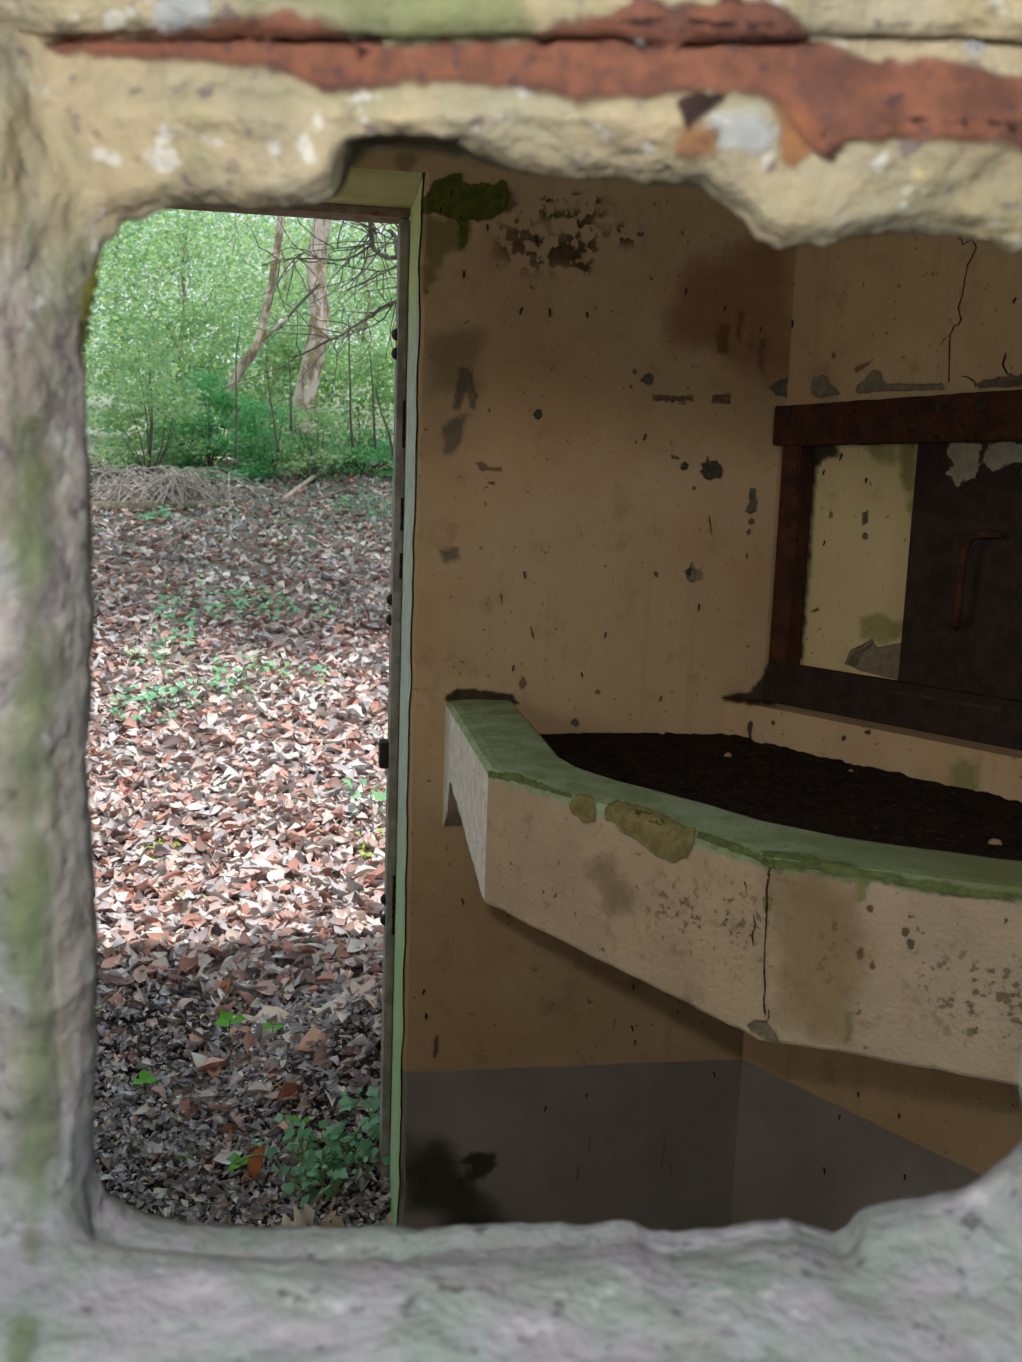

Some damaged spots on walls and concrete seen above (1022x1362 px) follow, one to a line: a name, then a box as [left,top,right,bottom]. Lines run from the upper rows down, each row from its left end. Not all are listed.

crack [940,237,1012,388]
spalling [811,375,839,398]
spalling [856,370,944,393]
spalling [976,374,1022,388]
spalling [569,793,696,863]
crack [744,863,771,1022]